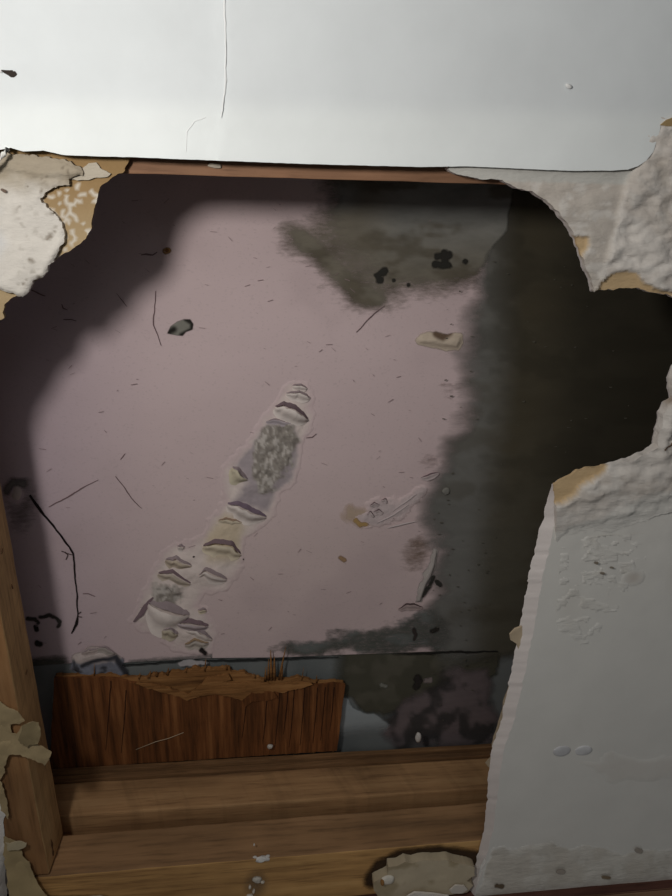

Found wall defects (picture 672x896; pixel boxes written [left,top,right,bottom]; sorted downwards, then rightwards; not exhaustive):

spalling [0,152,111,297]
spalling [448,117,672,297]
crack [29,454,141,634]
peeling [398,548,442,612]
water stain [282,180,672,749]
spalling [553,366,672,542]